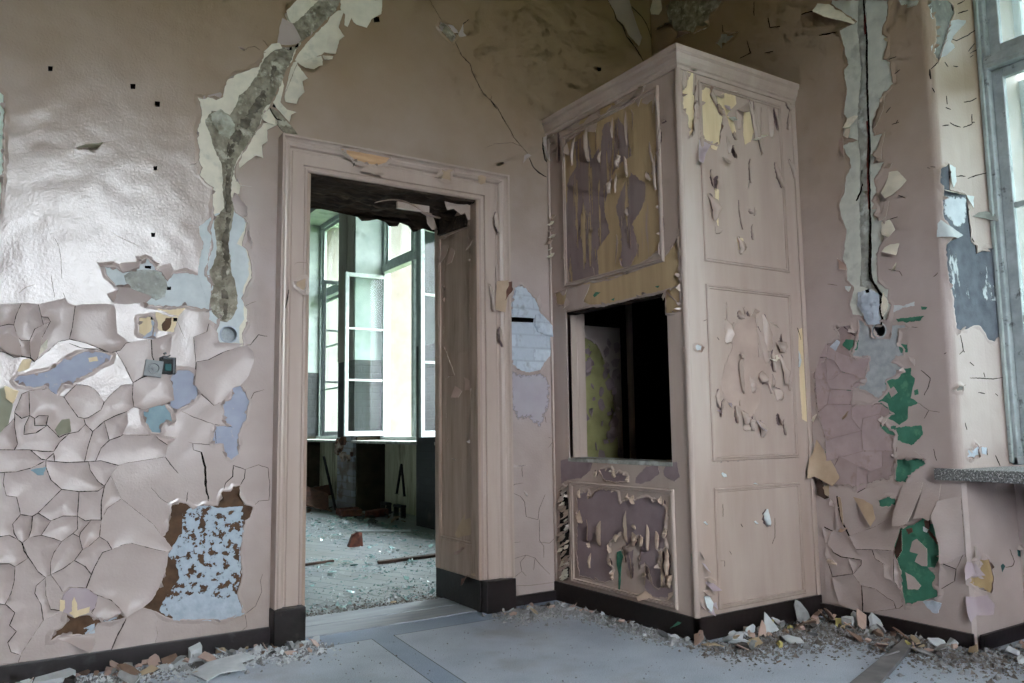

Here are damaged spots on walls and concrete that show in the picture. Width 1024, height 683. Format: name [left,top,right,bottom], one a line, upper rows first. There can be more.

peeling [0,0,382,683]
crack [455,42,546,177]
peeling [488,267,553,376]
peeling [542,85,682,316]
peeling [555,335,689,601]
peeling [681,0,1024,663]